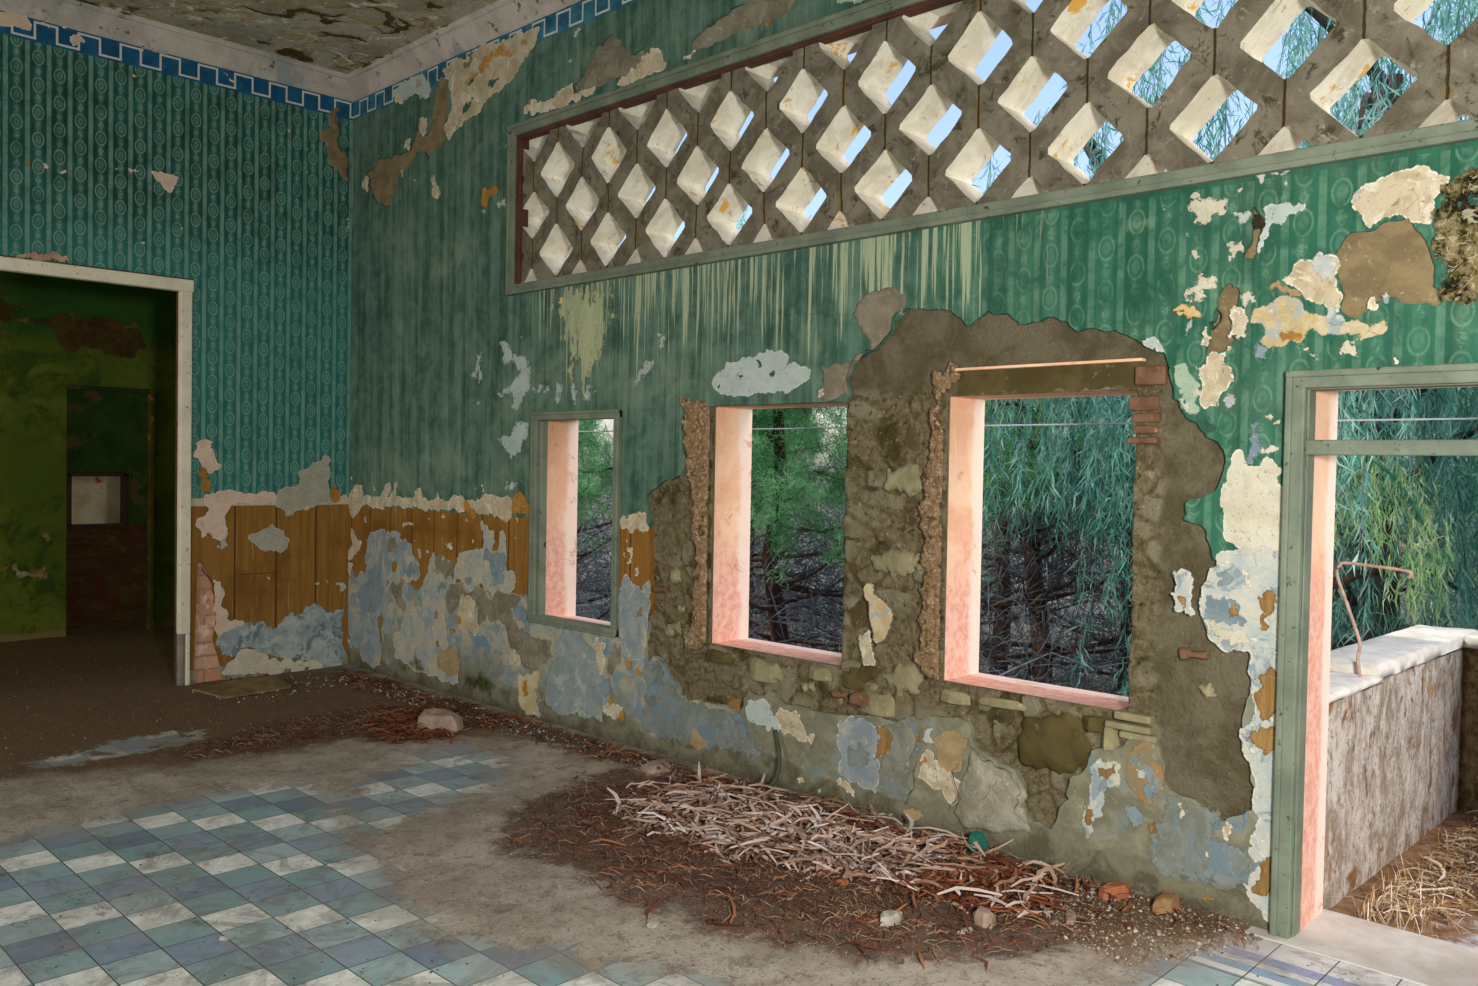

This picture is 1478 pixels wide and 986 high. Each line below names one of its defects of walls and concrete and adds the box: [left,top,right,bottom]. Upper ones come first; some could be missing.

peeling [307,26,540,206]
spalling [524,0,796,116]
spalling [193,165,1450,923]